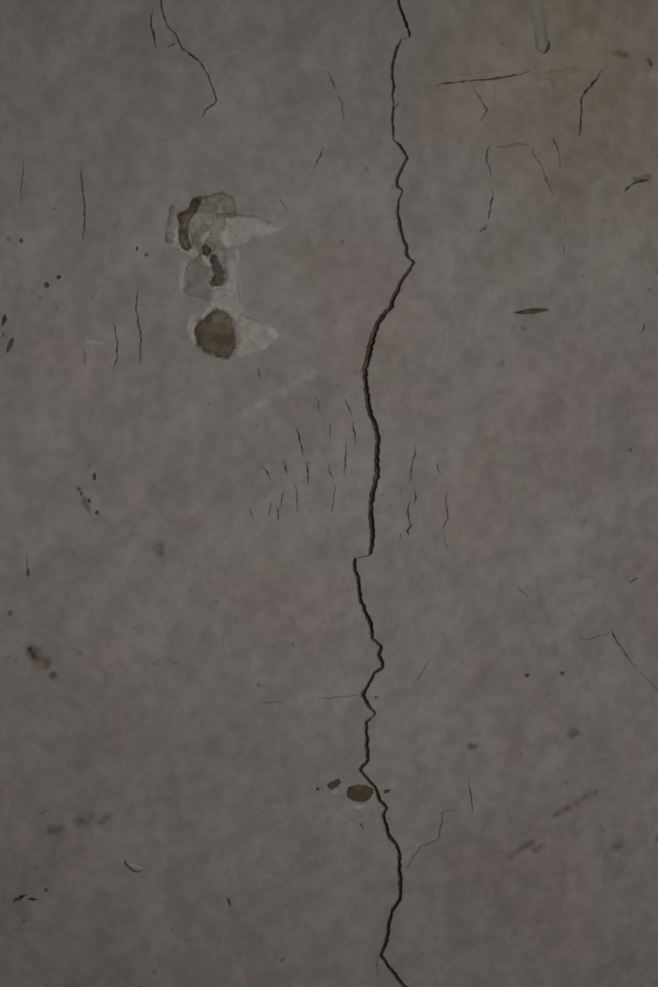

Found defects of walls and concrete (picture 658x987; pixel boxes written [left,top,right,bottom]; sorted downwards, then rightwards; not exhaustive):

crack [150,0,217,117]
crack [435,67,602,135]
crack [478,137,561,233]
flaking render [165,190,282,361]
crack [250,0,473,987]
flaking render [316,779,391,802]